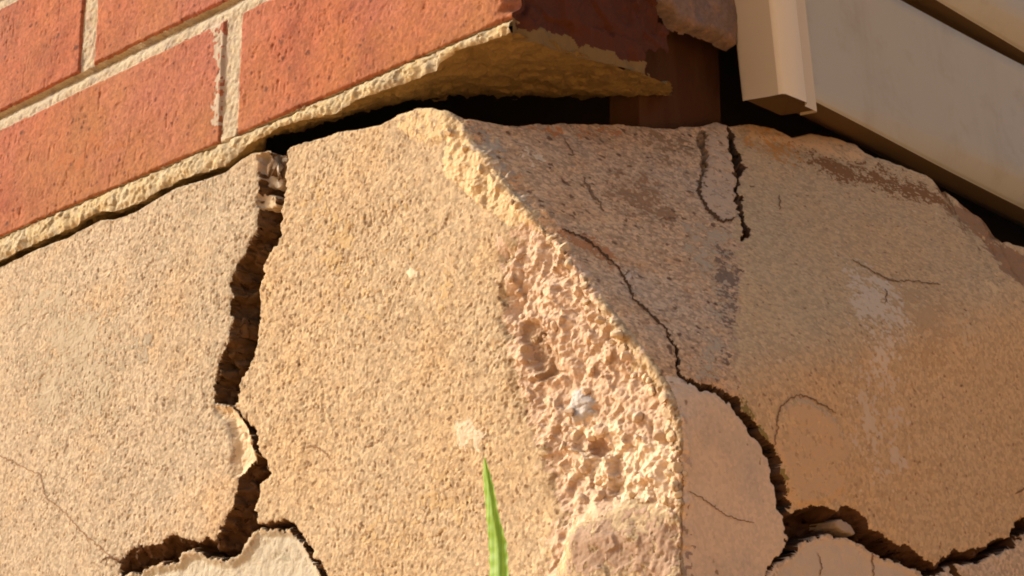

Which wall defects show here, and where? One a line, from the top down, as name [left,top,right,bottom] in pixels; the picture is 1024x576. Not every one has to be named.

crack [0,151,328,576]
spalling [441,114,692,576]
crack [565,140,604,211]
crack [695,126,751,242]
crack [562,228,1024,576]